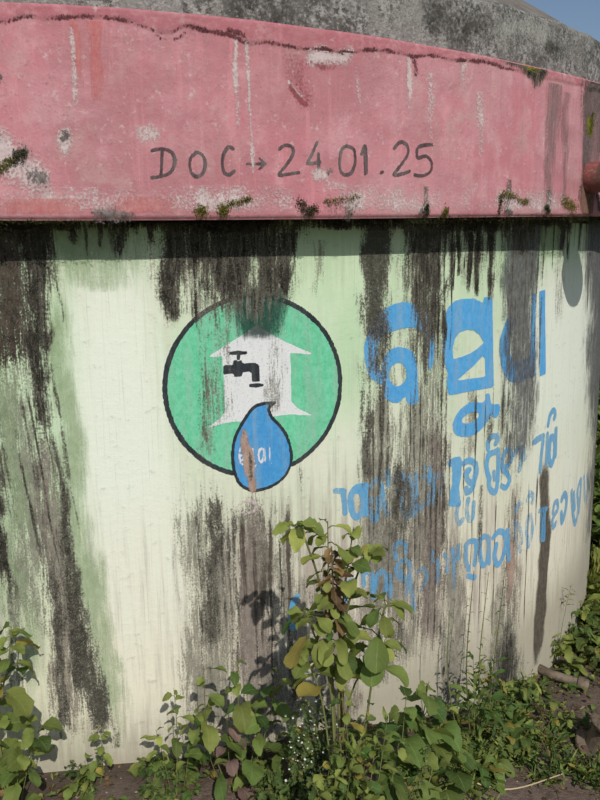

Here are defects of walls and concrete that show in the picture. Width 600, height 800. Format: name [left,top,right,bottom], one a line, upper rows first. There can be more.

peeling [0,127,75,213]
damp [69,19,81,105]
damp [232,39,255,174]
damp [501,60,548,87]
damp [578,79,600,196]
damp [0,83,578,738]
damp [584,218,600,536]